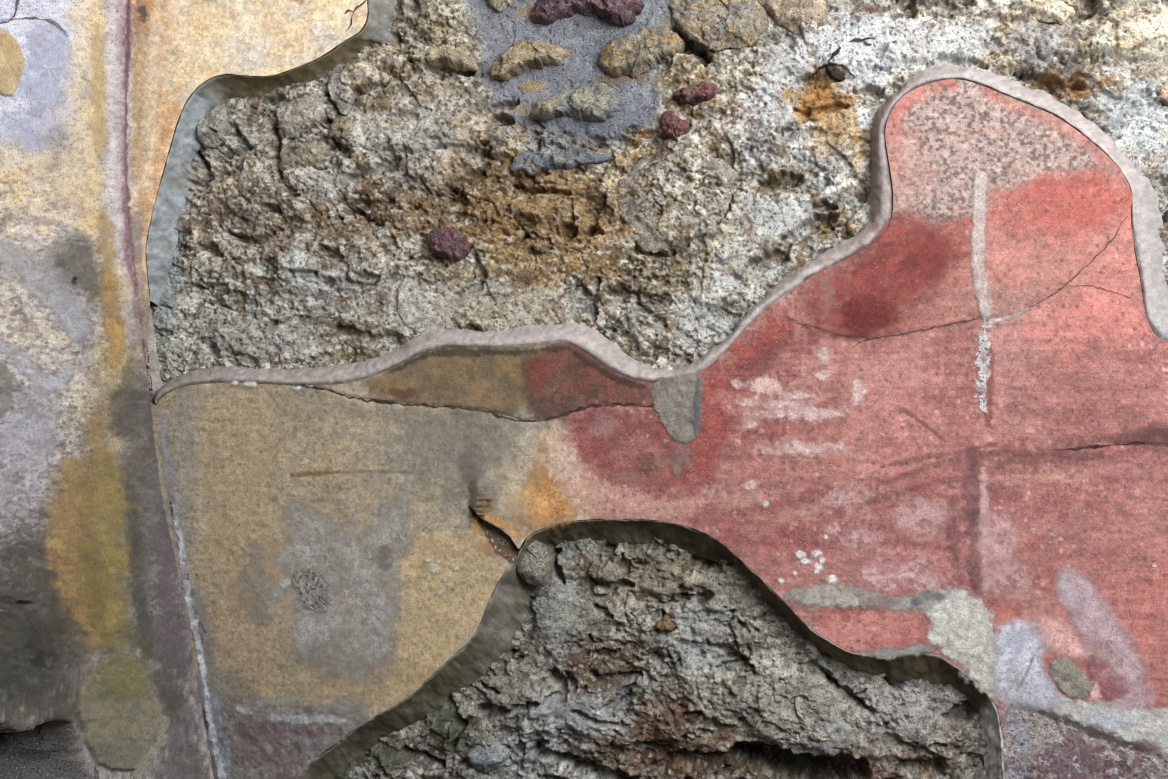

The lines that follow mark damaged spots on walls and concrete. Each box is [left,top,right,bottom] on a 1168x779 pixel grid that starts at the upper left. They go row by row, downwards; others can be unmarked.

crack [0,0,68,37]
spalling [146,0,1168,405]
leakage [808,216,948,336]
crack [784,216,1131,347]
peeling [732,377,867,428]
peeling [785,440,844,455]
crack [1054,441,1168,450]
peeling [826,487,861,504]
peeling [897,501,947,533]
spalling [272,569,330,613]
spalling [300,515,1168,779]